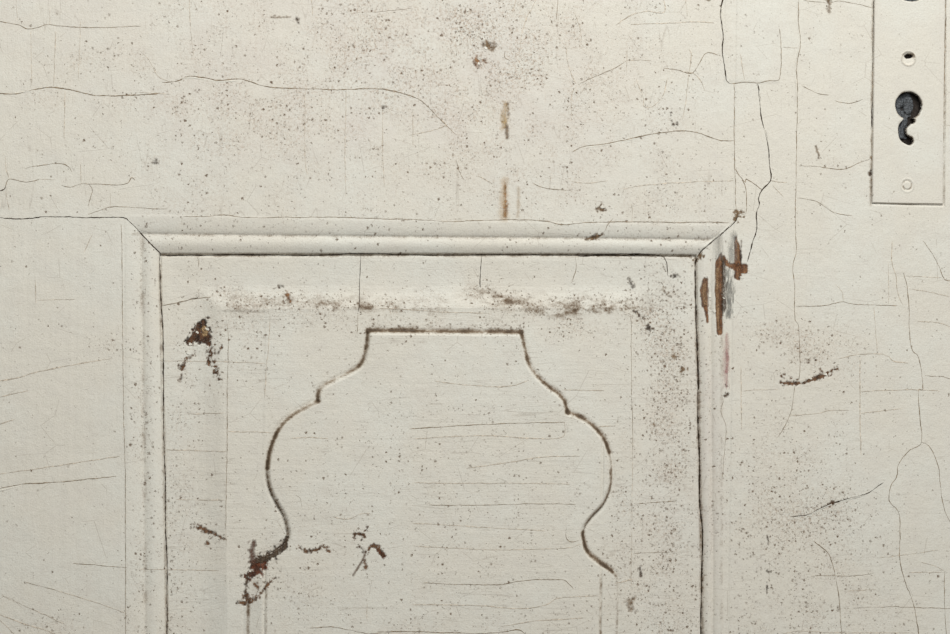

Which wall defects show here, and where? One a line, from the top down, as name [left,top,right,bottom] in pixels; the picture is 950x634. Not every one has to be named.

crack [0,0,454,171]
crack [0,159,161,254]
crack [412,422,576,550]